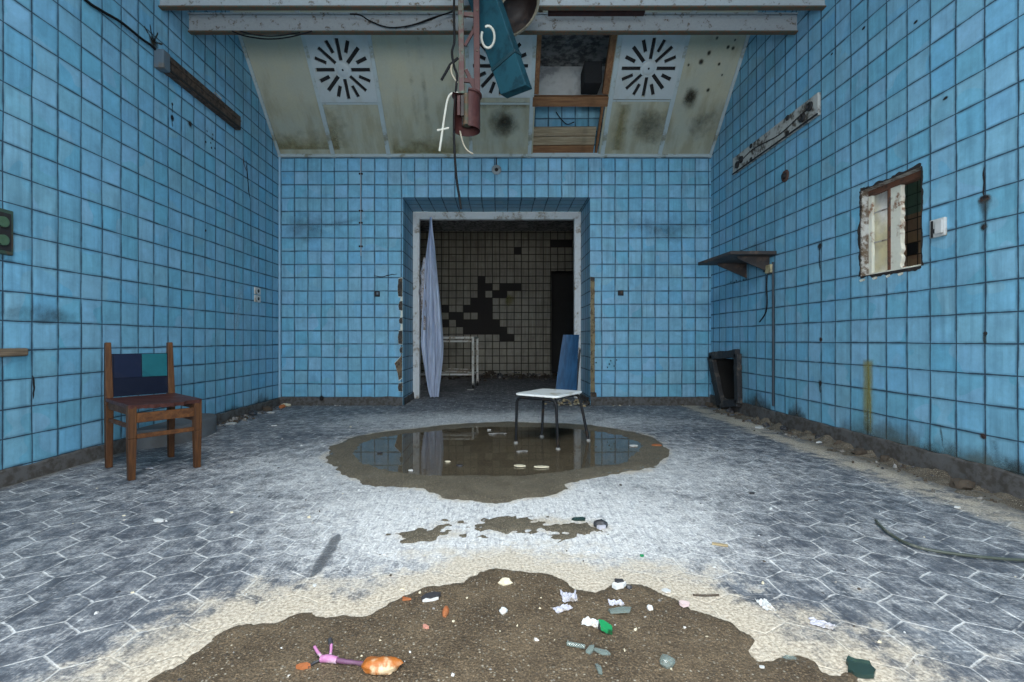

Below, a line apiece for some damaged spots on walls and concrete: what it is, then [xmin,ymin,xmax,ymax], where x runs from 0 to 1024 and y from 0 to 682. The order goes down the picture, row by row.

leakage [495,115,512,134]
spalling [857,163,924,282]